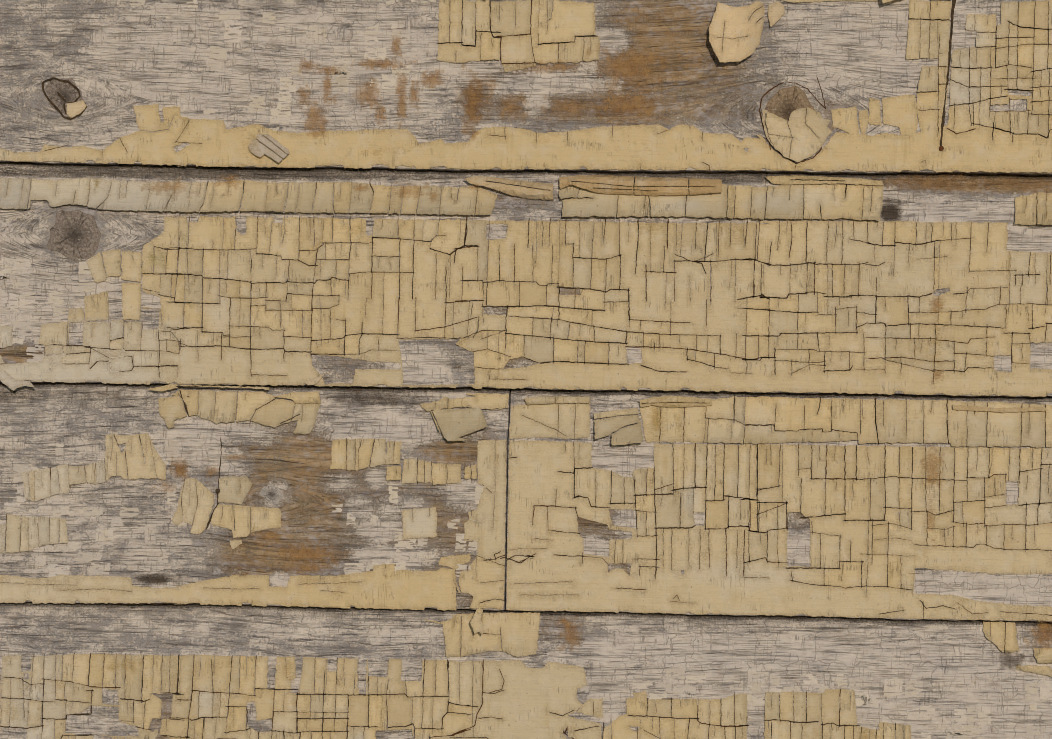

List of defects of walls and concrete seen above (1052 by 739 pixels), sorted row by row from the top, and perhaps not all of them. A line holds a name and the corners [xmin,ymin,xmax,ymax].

peeling [364,0,600,97]
crack [906,0,1052,146]
peeling [0,63,1052,226]
peeling [0,259,68,365]
peeling [78,249,141,321]
peeling [0,369,34,391]
crack [0,215,1052,621]
peeling [0,388,643,739]
crack [0,653,473,739]
crack [612,689,911,739]
peeling [737,671,935,739]
peeling [920,600,1052,710]